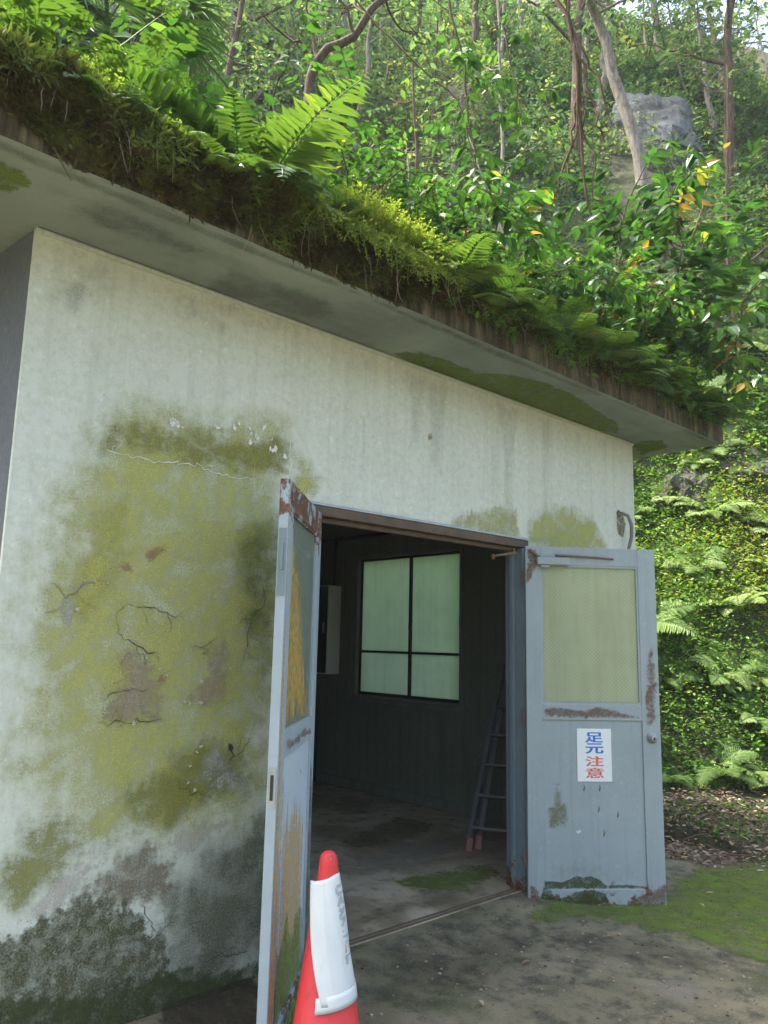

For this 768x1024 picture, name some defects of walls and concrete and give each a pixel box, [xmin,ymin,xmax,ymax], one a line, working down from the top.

crack [108,442,256,484]
spalling [233,421,287,459]
crack [45,575,186,727]
rust [545,707,629,718]
rust [646,652,657,723]
leakage [35,819,265,980]